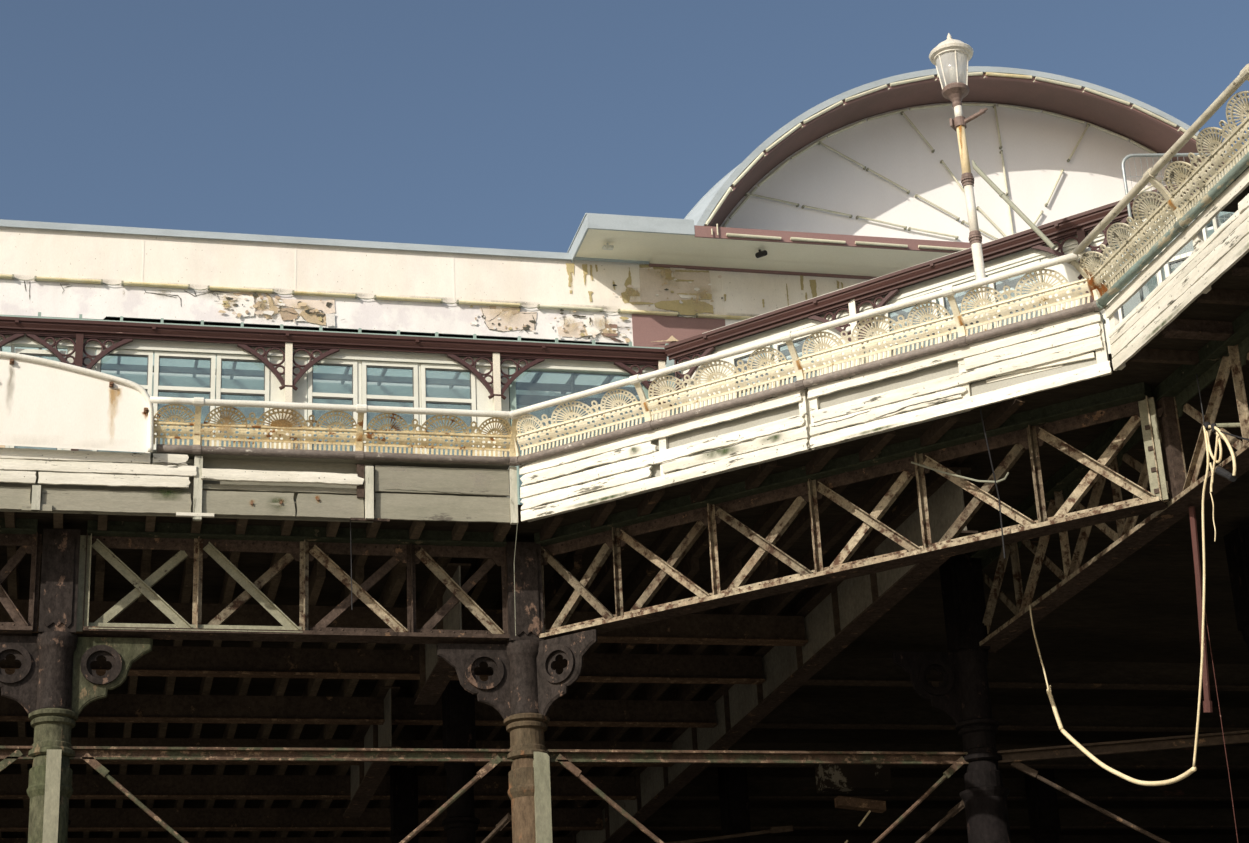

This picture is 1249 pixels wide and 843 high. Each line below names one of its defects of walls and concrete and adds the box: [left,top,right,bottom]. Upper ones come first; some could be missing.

peeling [218,292,335,326]
peeling [470,264,723,343]